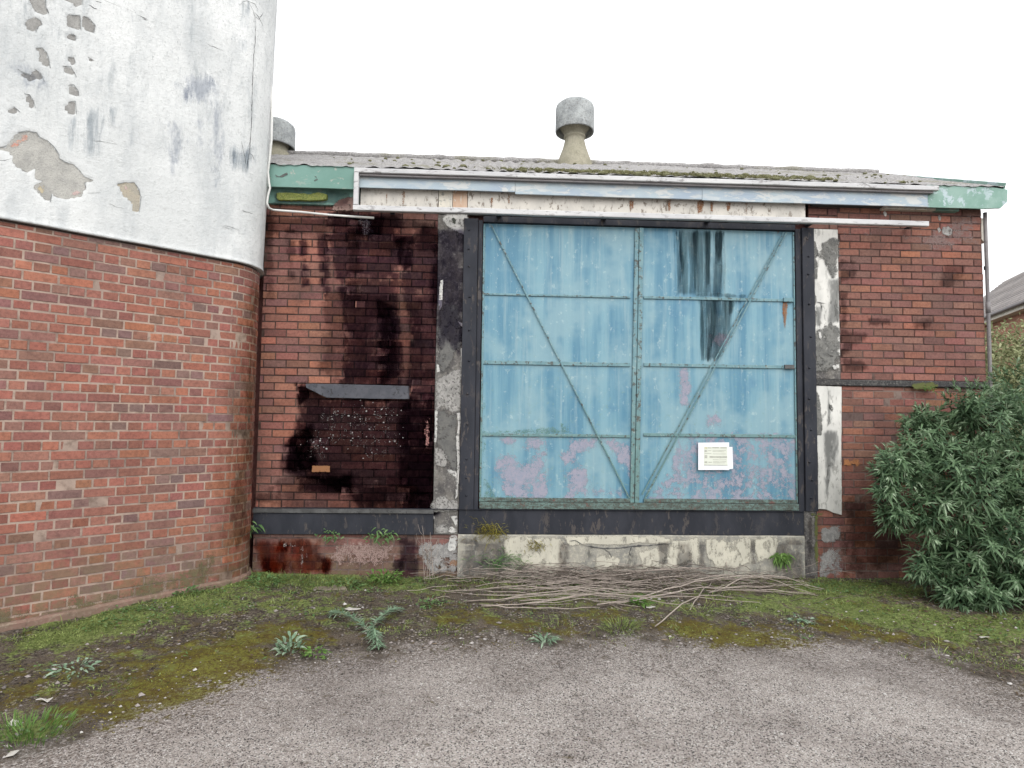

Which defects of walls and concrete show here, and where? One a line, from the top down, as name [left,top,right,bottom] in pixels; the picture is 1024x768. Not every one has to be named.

spalling [0,130,93,202]
spalling [117,182,141,212]
spalling [814,237,840,279]
leakage [282,213,464,514]
spalling [815,295,840,372]
spalling [817,393,833,435]
peeling [493,436,631,498]
peeling [650,414,796,504]
corrosion [257,539,330,574]
peeling [503,535,779,578]